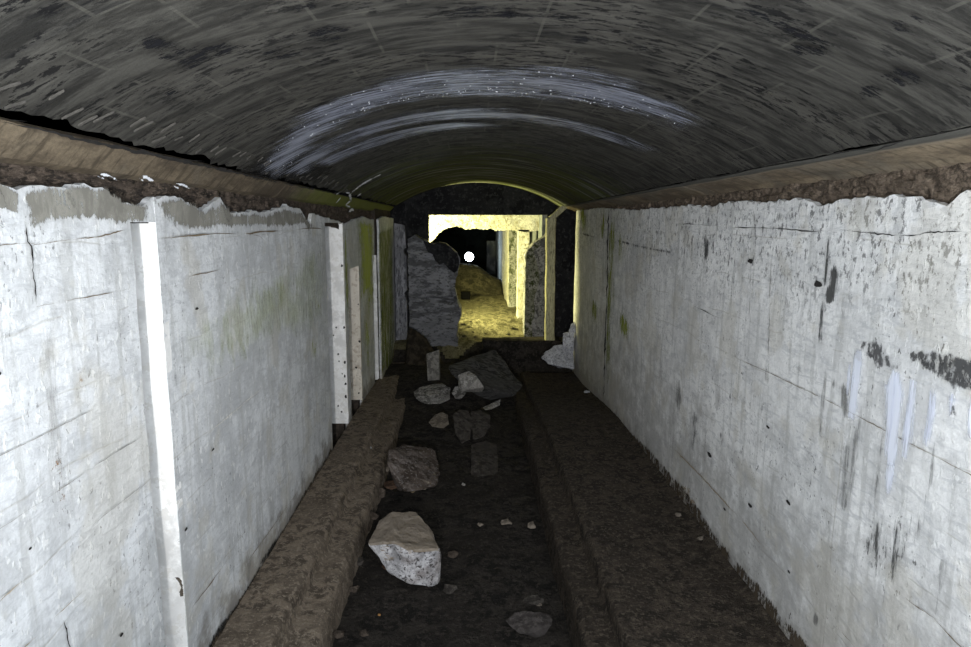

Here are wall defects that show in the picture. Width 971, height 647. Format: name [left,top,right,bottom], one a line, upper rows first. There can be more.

spalling [0,163,373,229]
spalling [608,162,971,210]
crack [578,126,969,401]
crack [742,270,971,475]
water stain [825,339,916,499]
water stain [910,351,971,415]
crack [0,439,138,529]